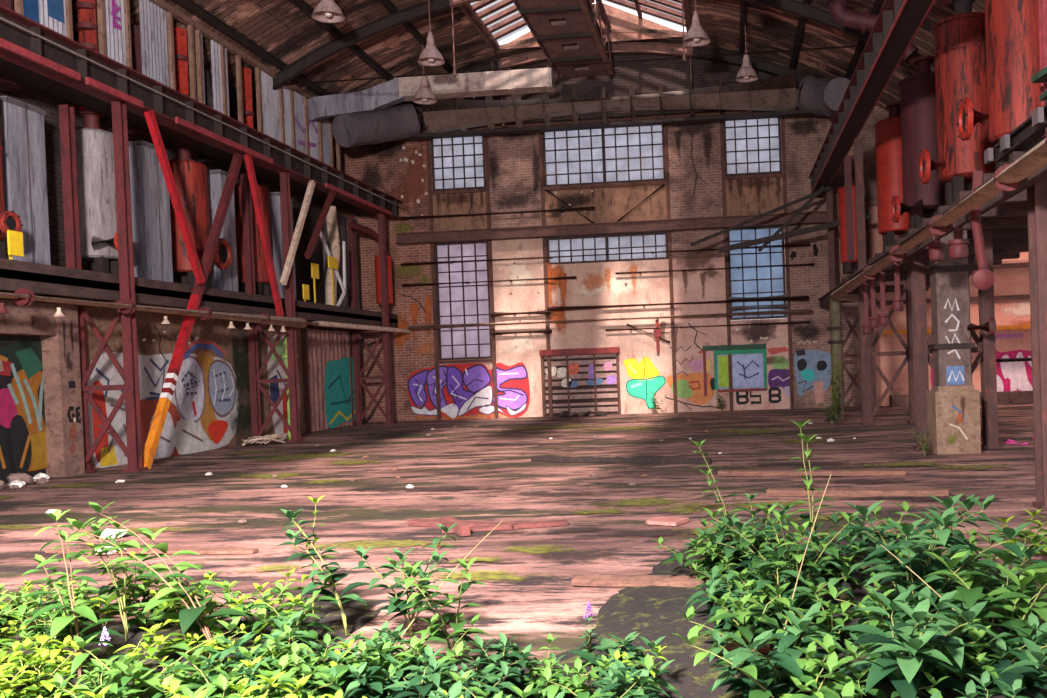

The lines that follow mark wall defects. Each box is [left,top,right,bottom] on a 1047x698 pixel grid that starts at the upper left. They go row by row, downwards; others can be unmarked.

corrosion [547,262,567,331]